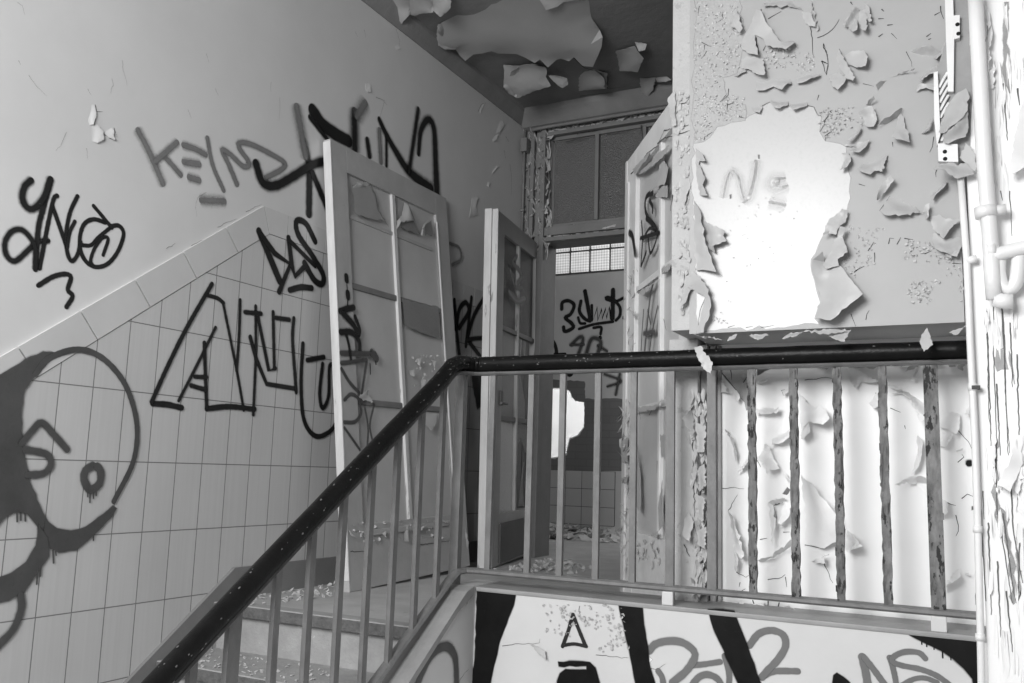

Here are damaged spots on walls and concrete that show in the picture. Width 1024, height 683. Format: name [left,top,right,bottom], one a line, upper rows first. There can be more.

peeling [88,105,117,143]
peeling [393,0,611,98]
peeling [511,128,554,260]
peeling [565,1,979,415]
flaking render [551,379,664,574]
peeling [682,389,707,597]
peeling [722,487,794,609]
peeling [725,388,862,583]
peeling [848,360,927,496]
peeling [940,334,1024,535]